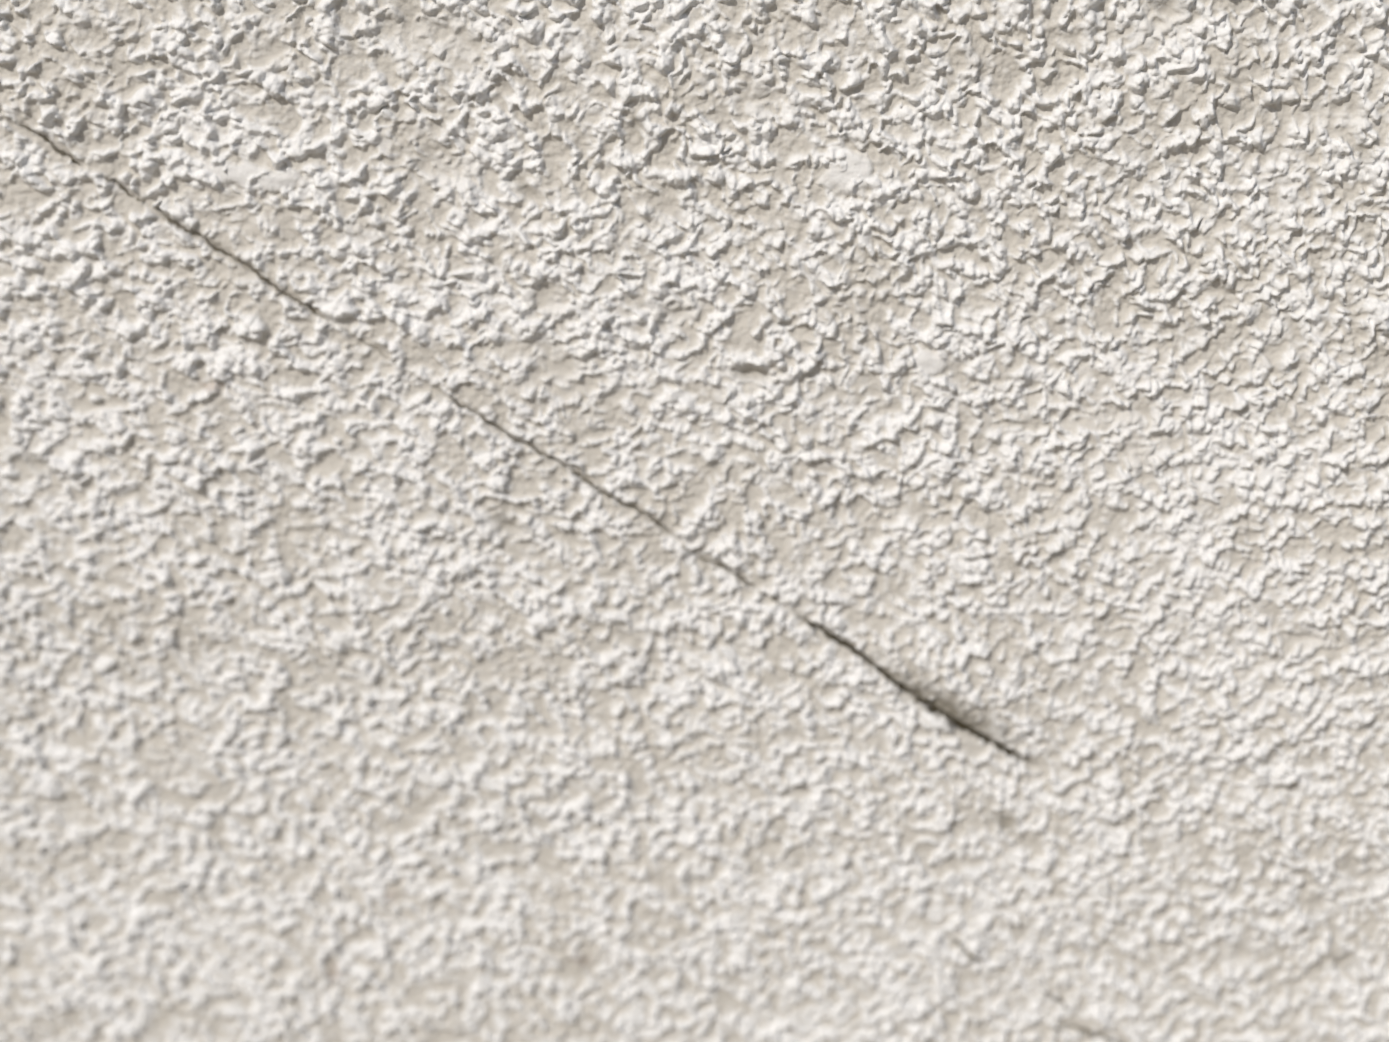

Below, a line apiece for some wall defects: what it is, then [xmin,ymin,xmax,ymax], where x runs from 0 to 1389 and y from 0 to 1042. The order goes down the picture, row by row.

crack [21,125,323,317]
crack [450,397,1030,762]